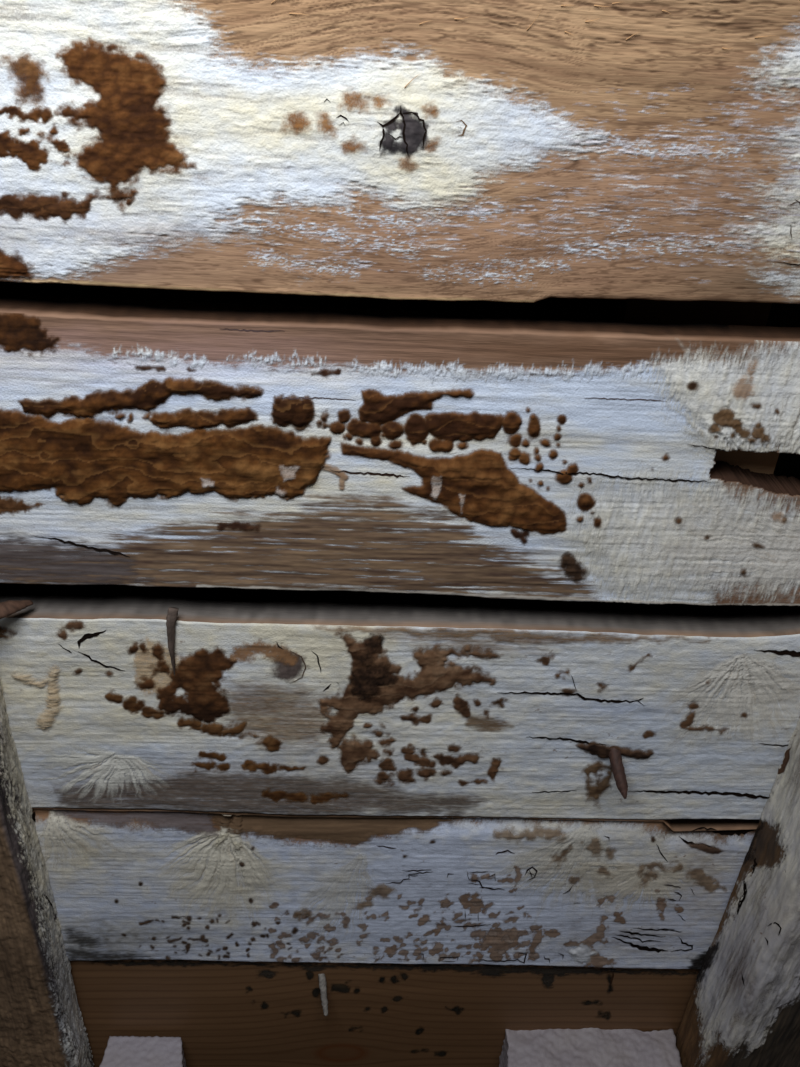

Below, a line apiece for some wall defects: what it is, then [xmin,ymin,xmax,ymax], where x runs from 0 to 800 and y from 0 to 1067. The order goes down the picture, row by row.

water stain [0,0,800,299]
peeling [275,466,299,497]
peeling [321,464,348,490]
water stain [0,341,800,606]
peeling [431,477,442,499]
crack [756,649,800,657]
crack [497,675,643,705]
crack [529,736,606,745]
crack [631,743,790,799]
water stain [0,618,800,1067]
peeling [268,866,626,968]
peeling [655,889,684,920]